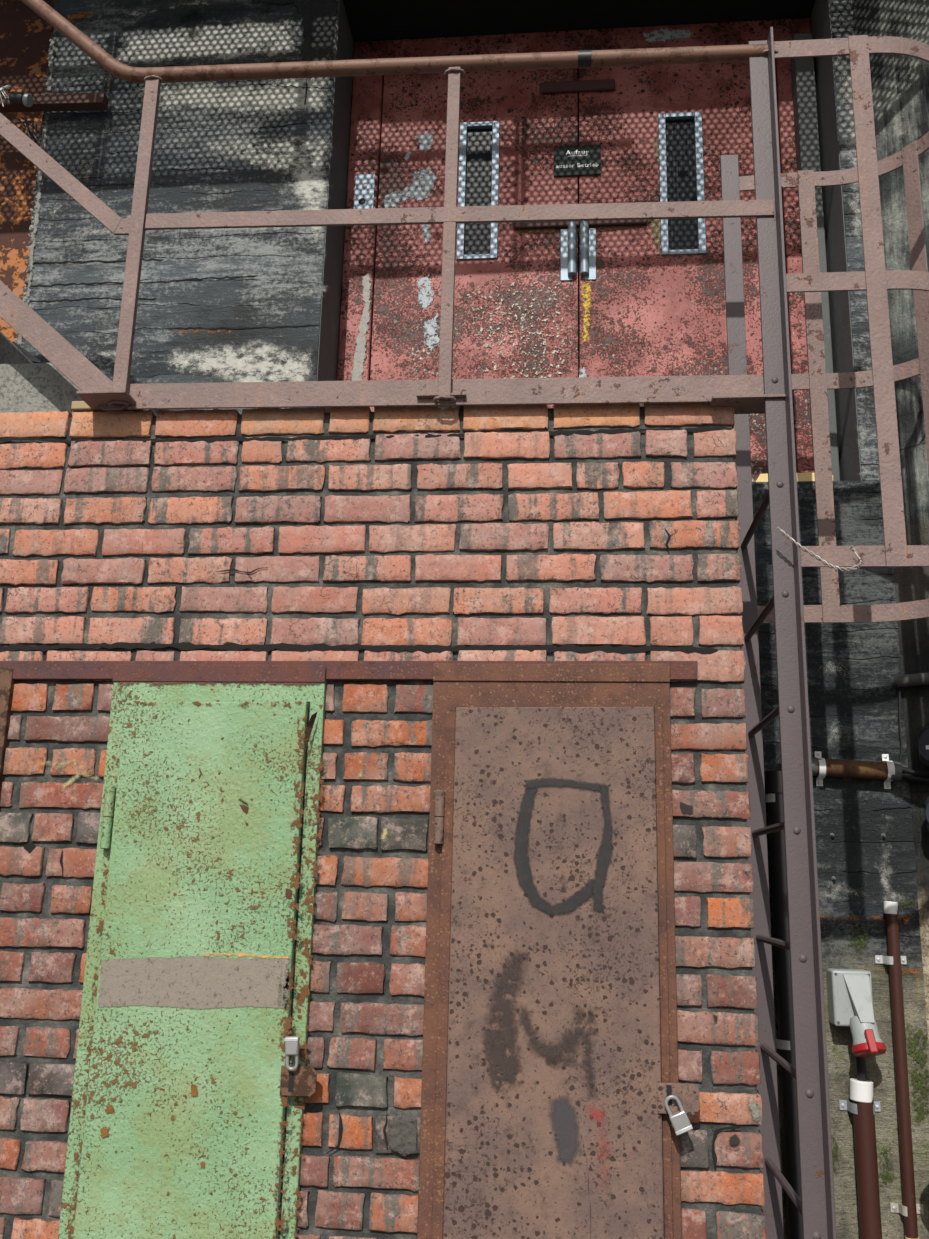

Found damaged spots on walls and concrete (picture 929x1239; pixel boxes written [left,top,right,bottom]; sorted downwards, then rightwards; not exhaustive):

peeling [384,132,436,208]
peeling [422,224,430,243]
rust [96,850,109,944]
rust [118,682,327,1066]
rust [81,1020,94,1115]
rust [67,1134,82,1239]
rust [100,1104,114,1138]
rust [272,1096,307,1239]